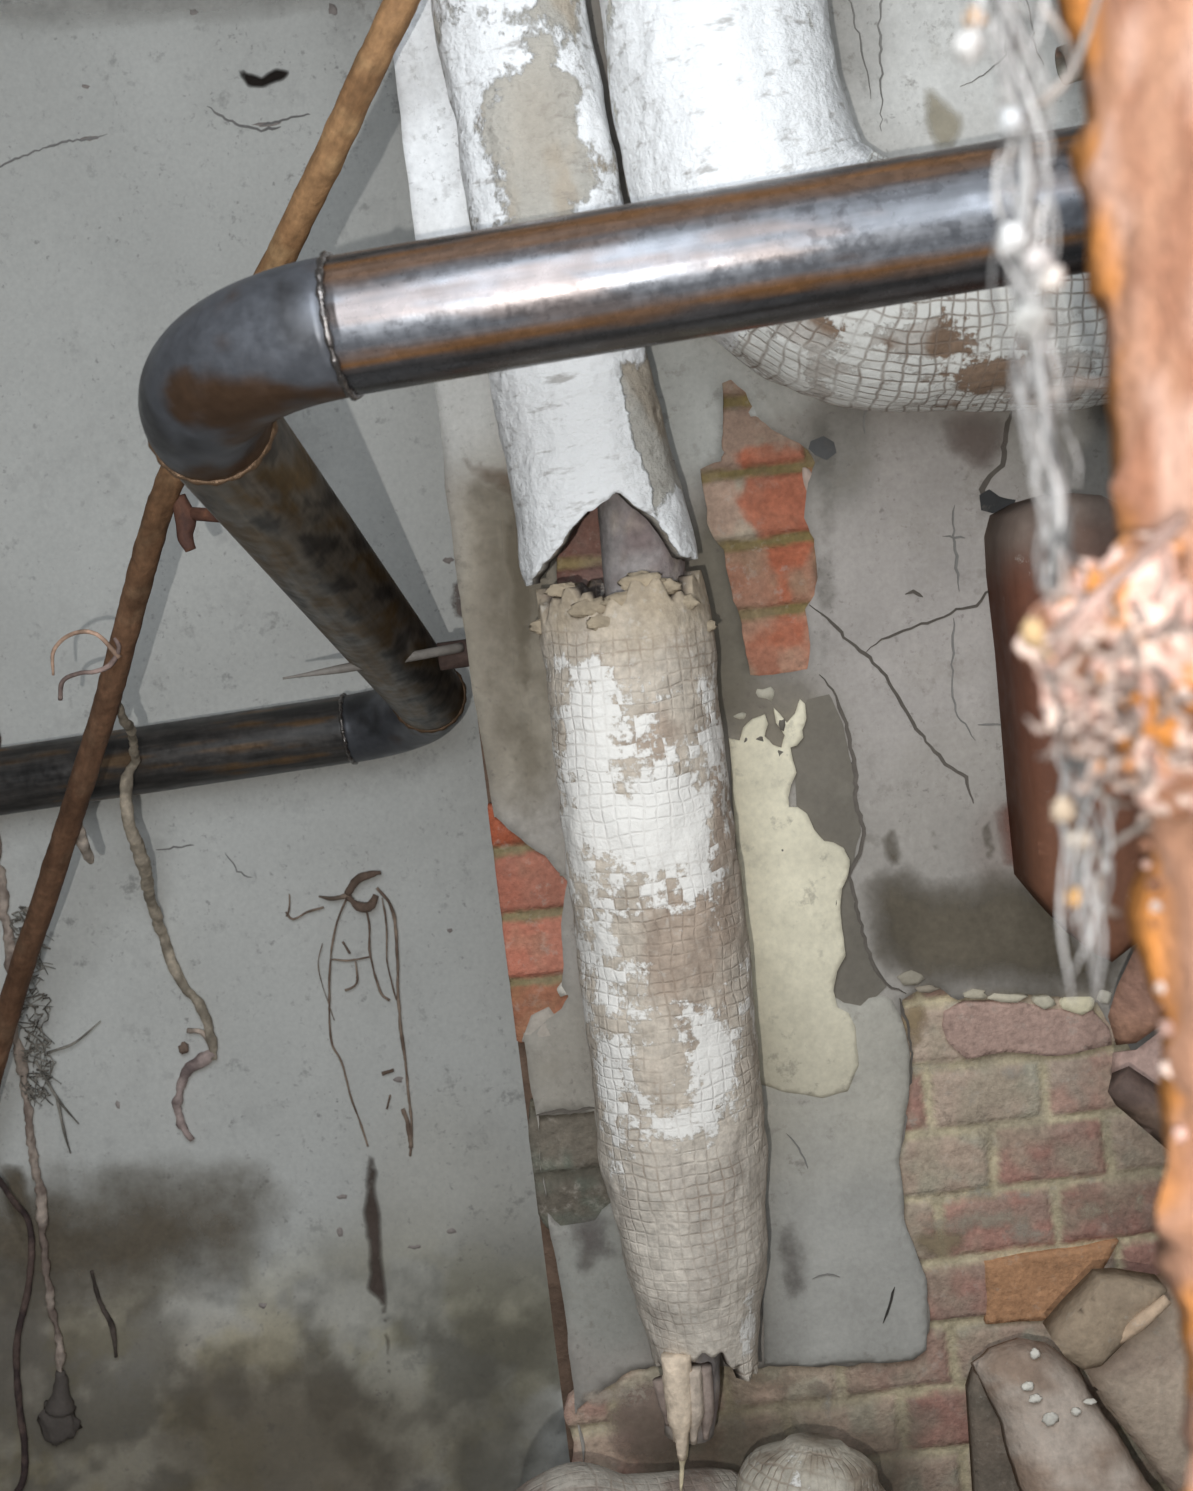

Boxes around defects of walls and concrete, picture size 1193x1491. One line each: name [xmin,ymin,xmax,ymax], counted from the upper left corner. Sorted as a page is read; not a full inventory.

crack [849,0,884,131]
crack [960,8,1044,87]
crack [809,410,1012,803]
spalling [488,803,568,1043]
crack [820,675,913,1086]
spalling [700,380,1171,1491]
water stain [0,1169,251,1291]
water stain [364,1161,385,1304]
spalling [528,1099,611,1229]
spalling [564,1366,663,1474]